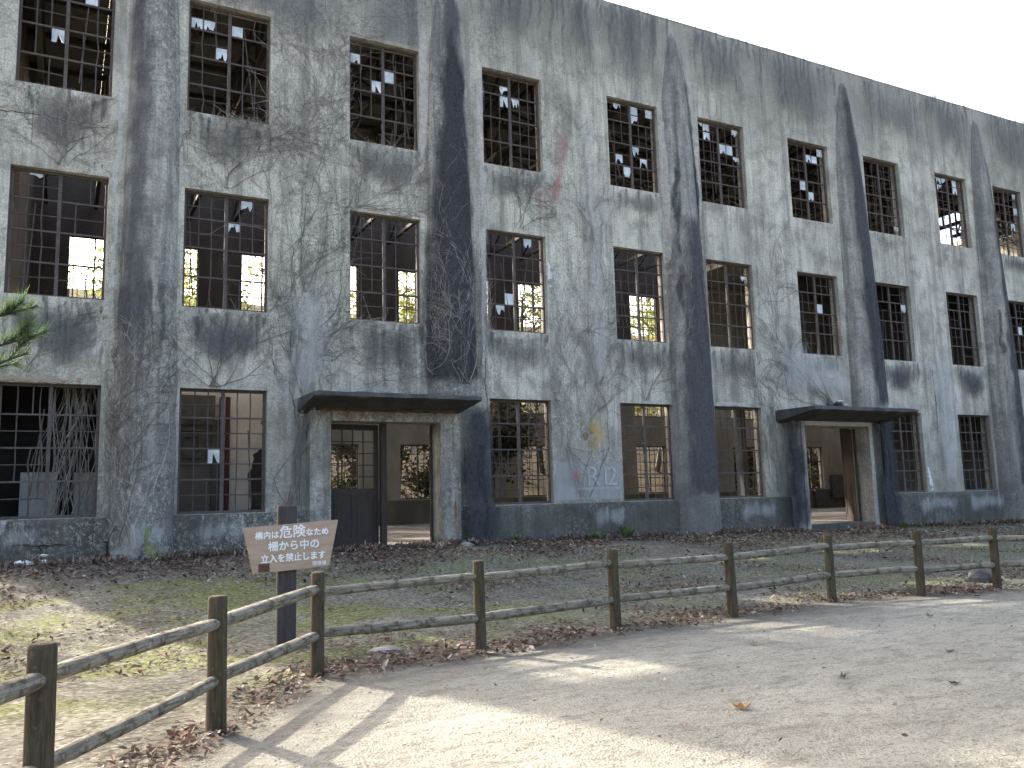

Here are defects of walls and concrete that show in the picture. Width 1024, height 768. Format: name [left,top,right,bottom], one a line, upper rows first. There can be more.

water stain [119,105,165,352]
water stain [134,0,151,92]
water stain [196,309,264,358]
water stain [372,0,477,384]
water stain [620,80,754,492]
water stain [694,26,919,404]
water stain [898,89,971,137]
water stain [958,366,987,394]
water stain [987,168,1024,483]